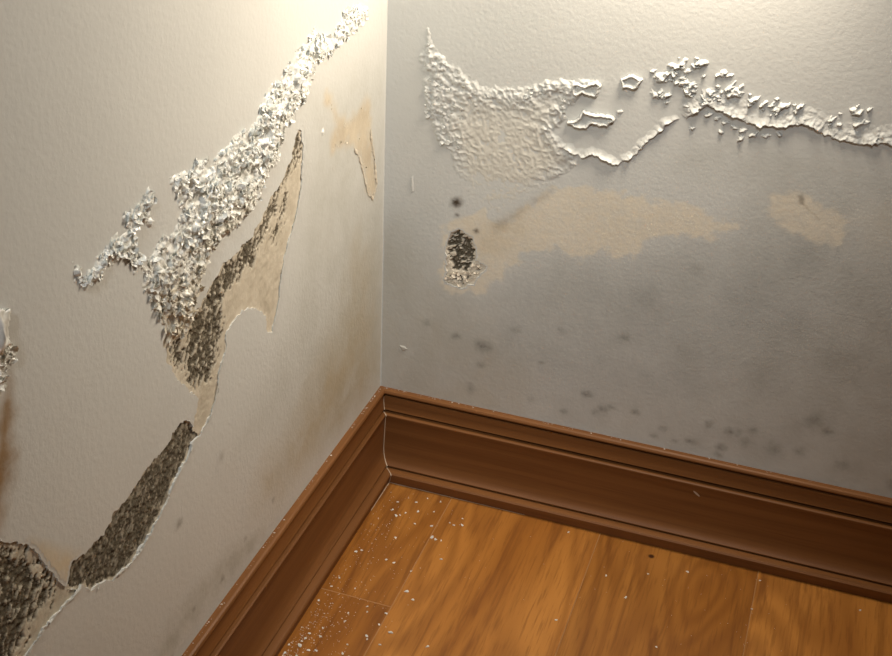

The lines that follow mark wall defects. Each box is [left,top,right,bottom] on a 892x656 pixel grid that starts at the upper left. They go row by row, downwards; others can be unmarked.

peeling [0,3,370,656]
leakage [154,14,386,656]
spalling [444,229,486,288]
leakage [382,110,892,498]